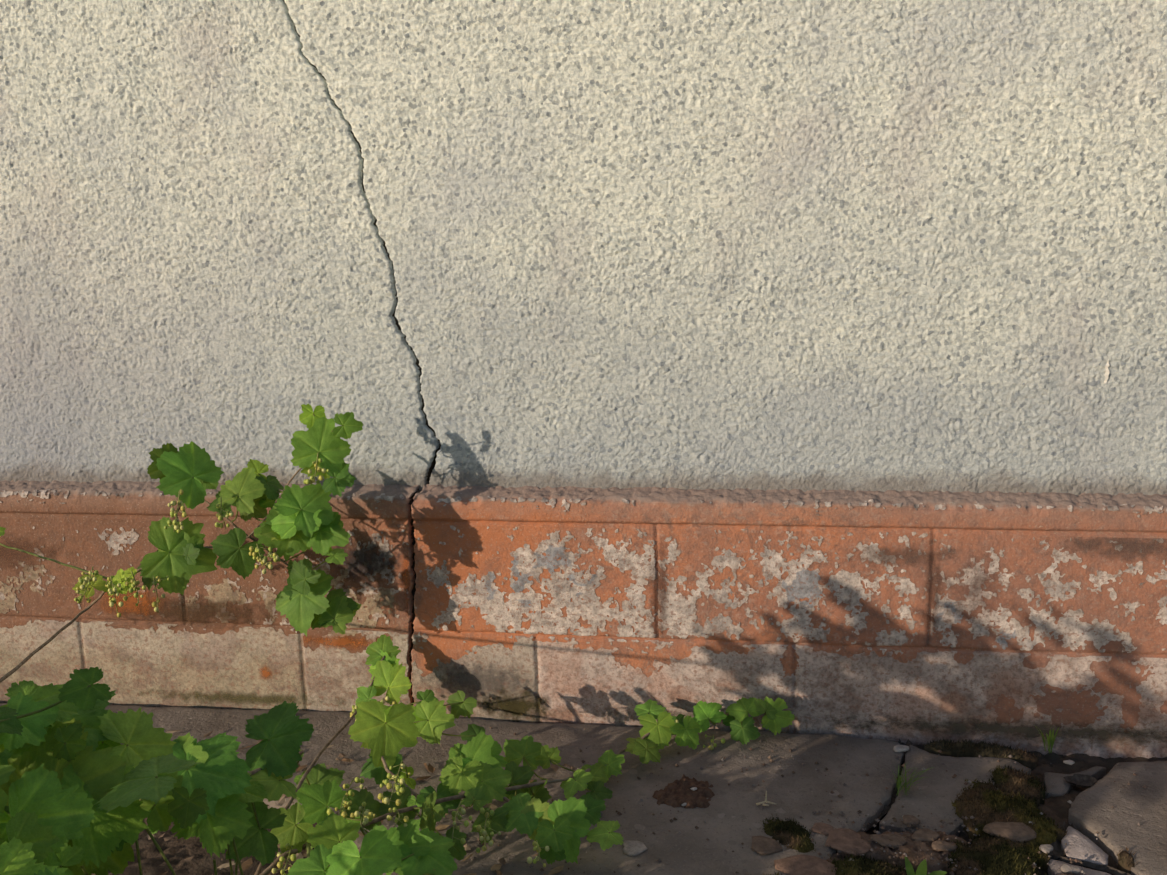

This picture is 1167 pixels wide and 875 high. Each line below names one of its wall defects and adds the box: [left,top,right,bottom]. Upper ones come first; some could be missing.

crack [311,64,441,705]
peeling [0,526,1167,759]